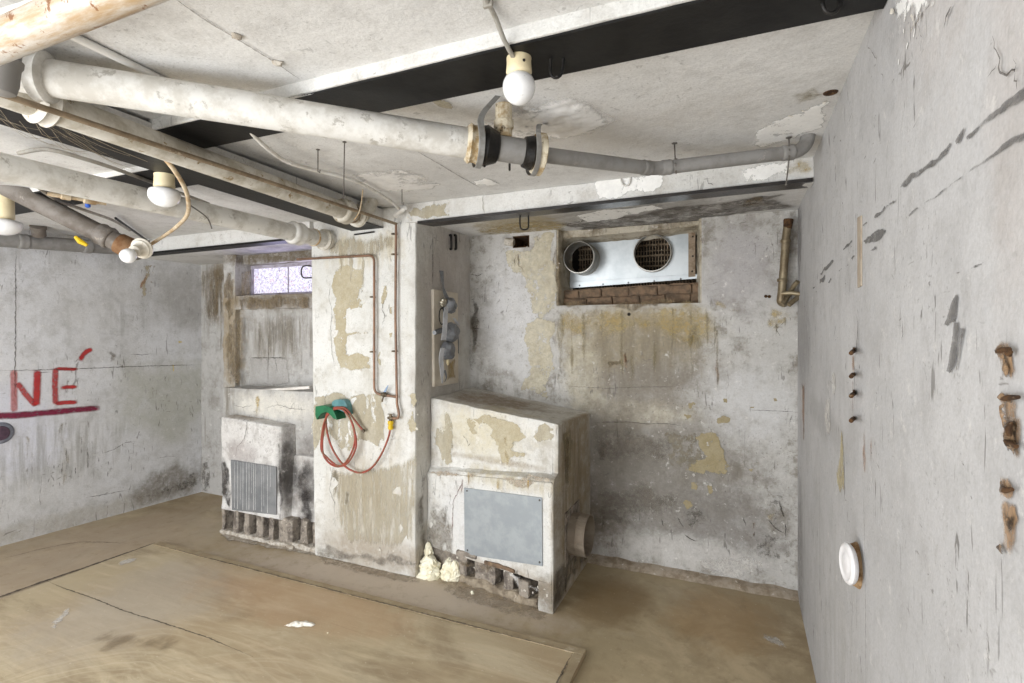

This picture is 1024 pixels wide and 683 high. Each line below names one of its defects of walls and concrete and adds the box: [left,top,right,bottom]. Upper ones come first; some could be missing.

peeling [890,0,934,49]
crack [987,36,1017,88]
peeling [753,89,838,147]
water stain [208,272,250,384]
peeling [331,265,381,371]
flaking render [503,231,560,398]
peeling [431,407,453,465]
peeling [463,414,556,463]
peeling [658,398,730,509]